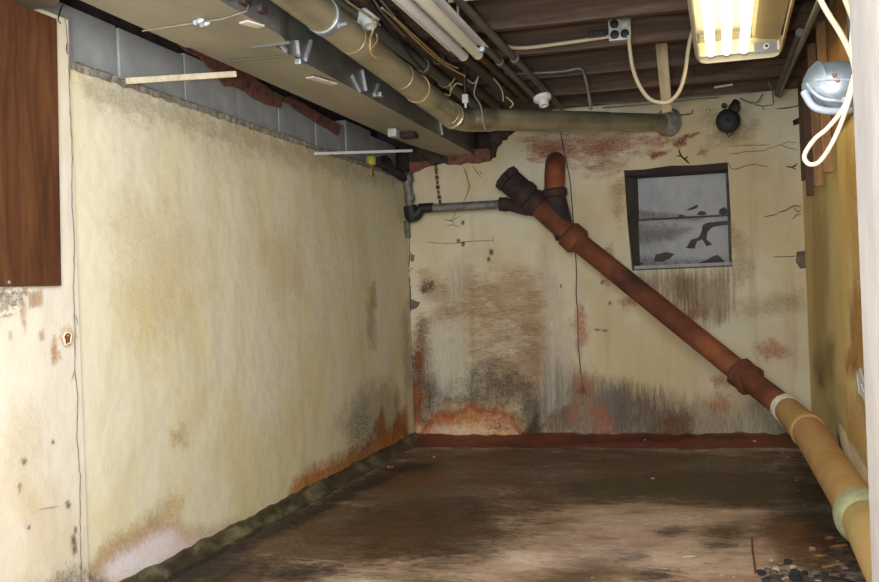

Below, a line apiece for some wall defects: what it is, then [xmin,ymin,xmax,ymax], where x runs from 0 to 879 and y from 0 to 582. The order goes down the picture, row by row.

crack [728,141,797,170]
crack [408,166,494,313]
damp [422,367,750,435]
peeling [856,368,865,407]
flaking render [837,423,869,487]
damp [181,446,866,582]
damp [55,521,218,582]